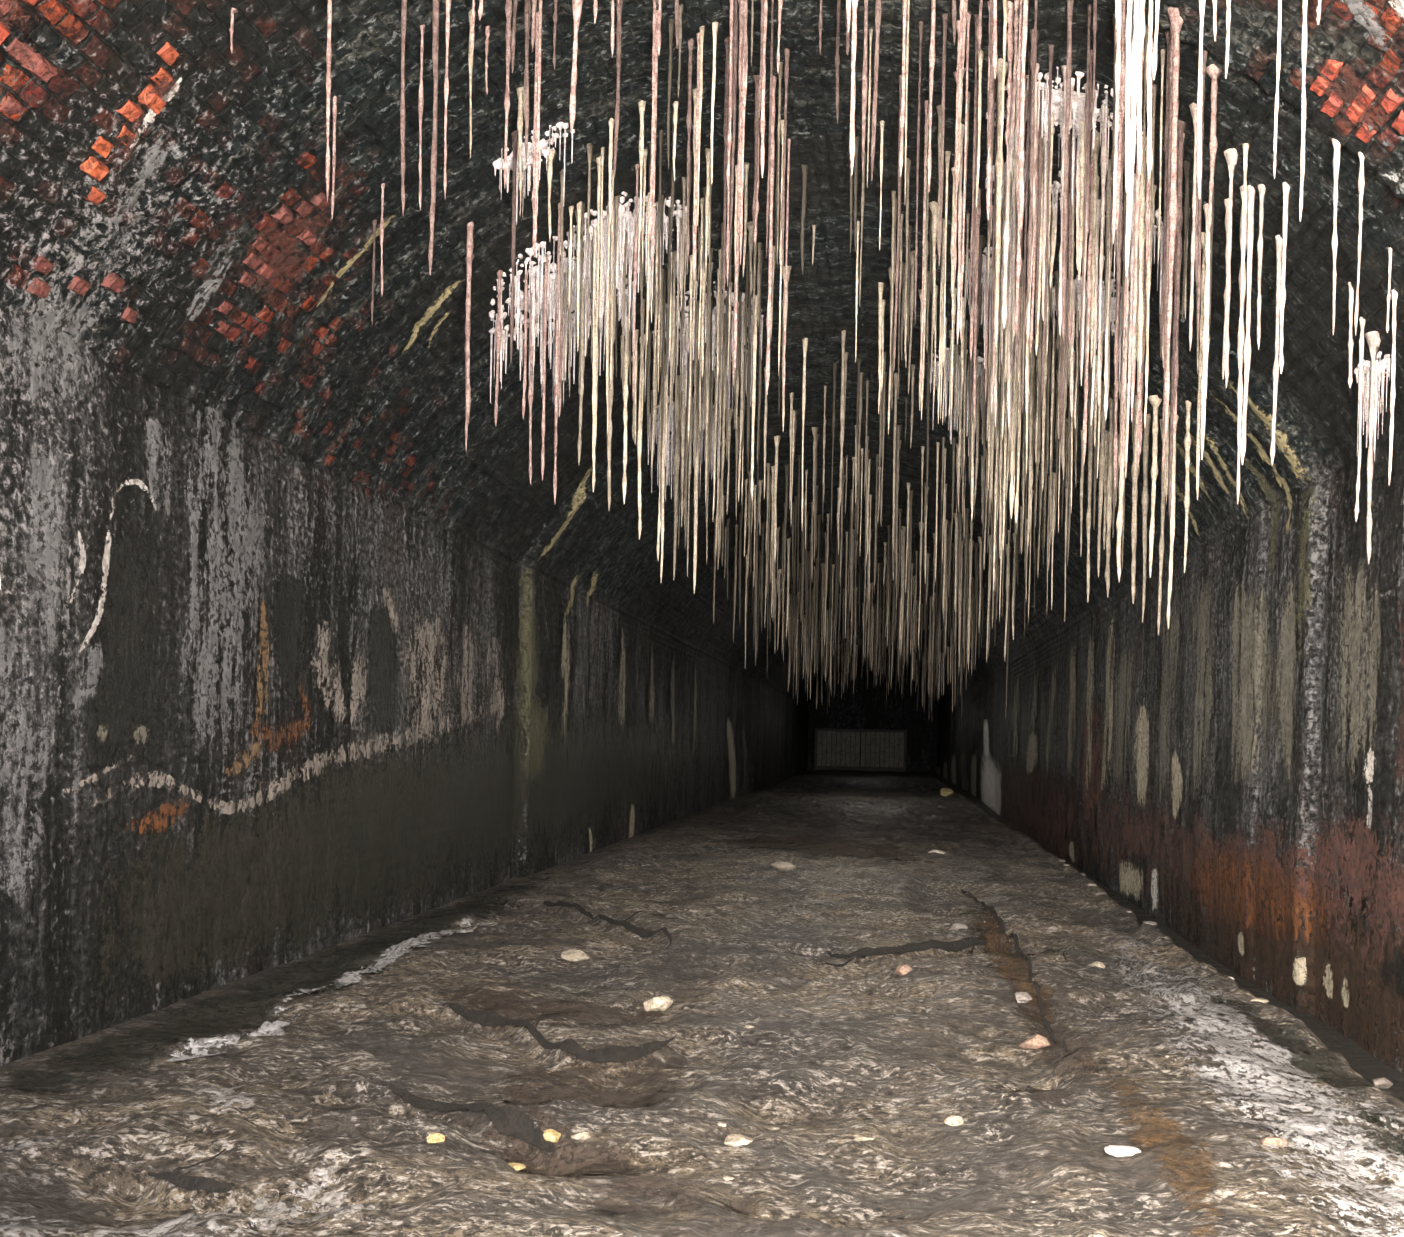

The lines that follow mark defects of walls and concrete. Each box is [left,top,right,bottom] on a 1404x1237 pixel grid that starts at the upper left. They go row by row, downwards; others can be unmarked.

spalling [0,0,58,82]
spalling [80,42,179,205]
water stain [985,66,1143,254]
spalling [1308,55,1404,143]
water stain [489,191,764,502]
water stain [0,396,747,1093]
crack [442,1002,677,1063]
crack [542,901,672,948]
crack [825,884,1068,1052]
rust [975,908,1056,1024]
rust [995,705,1404,1075]
rust [1097,1077,1228,1237]